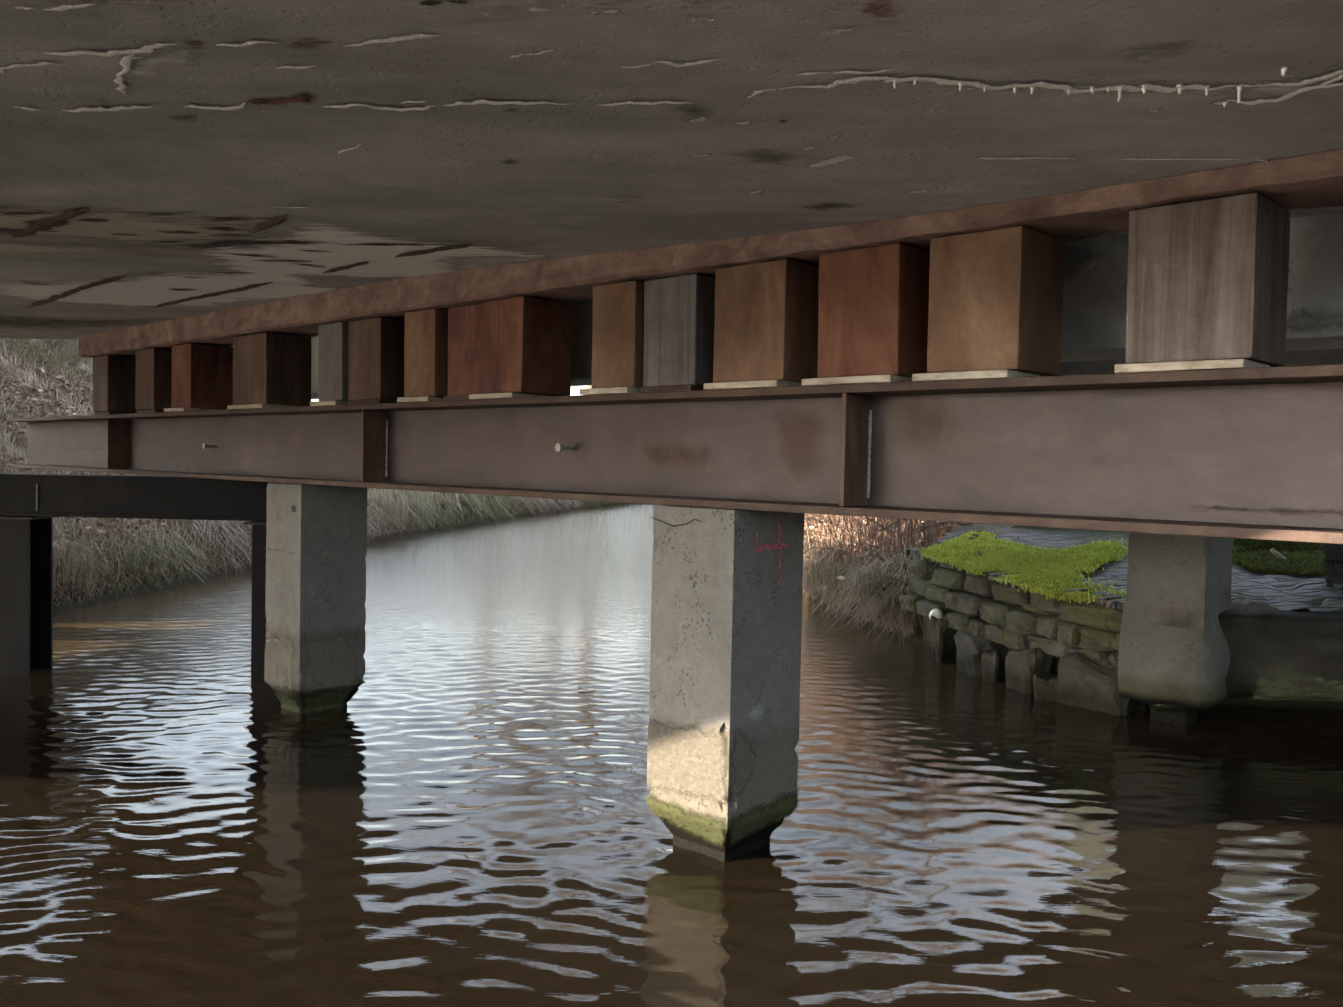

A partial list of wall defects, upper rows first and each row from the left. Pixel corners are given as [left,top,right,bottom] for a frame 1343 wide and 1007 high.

crack [15,3,95,11]
crack [344,33,440,47]
crack [511,49,554,57]
crack [621,59,724,68]
crack [0,41,315,113]
crack [747,67,1343,113]
crack [323,100,693,112]
crack [338,144,362,154]
water stain [264,633,357,693]